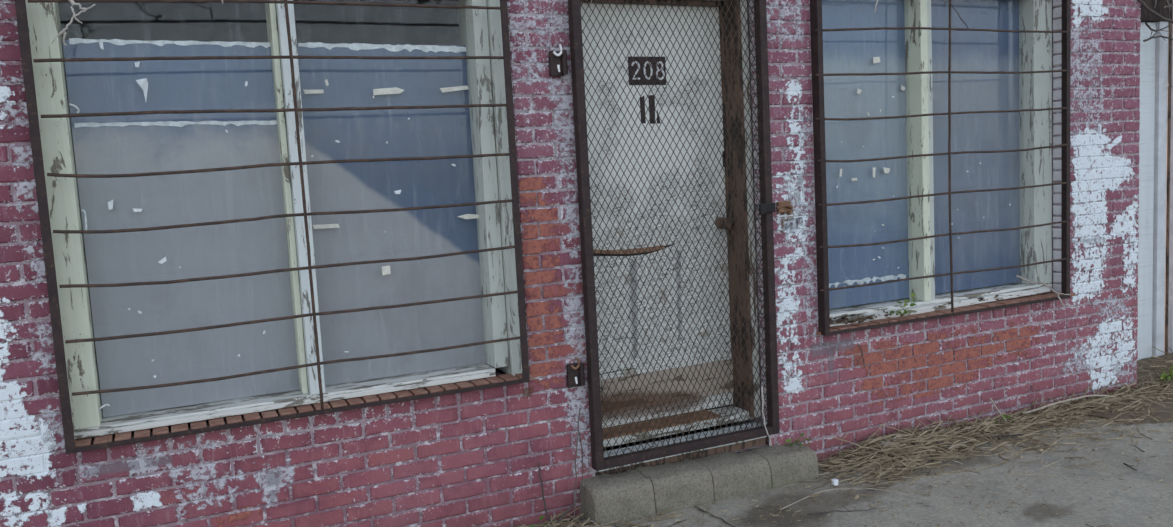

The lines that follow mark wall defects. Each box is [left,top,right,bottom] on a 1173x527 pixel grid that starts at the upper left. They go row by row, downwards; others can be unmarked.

peeling [766,0,804,44]
peeling [0,62,29,129]
peeling [7,144,39,213]
peeling [20,237,46,288]
peeling [509,0,591,476]
peeling [772,80,822,394]
peeling [1063,0,1139,393]
peeling [845,323,1040,407]
peeling [0,297,87,527]
peeling [79,463,101,479]